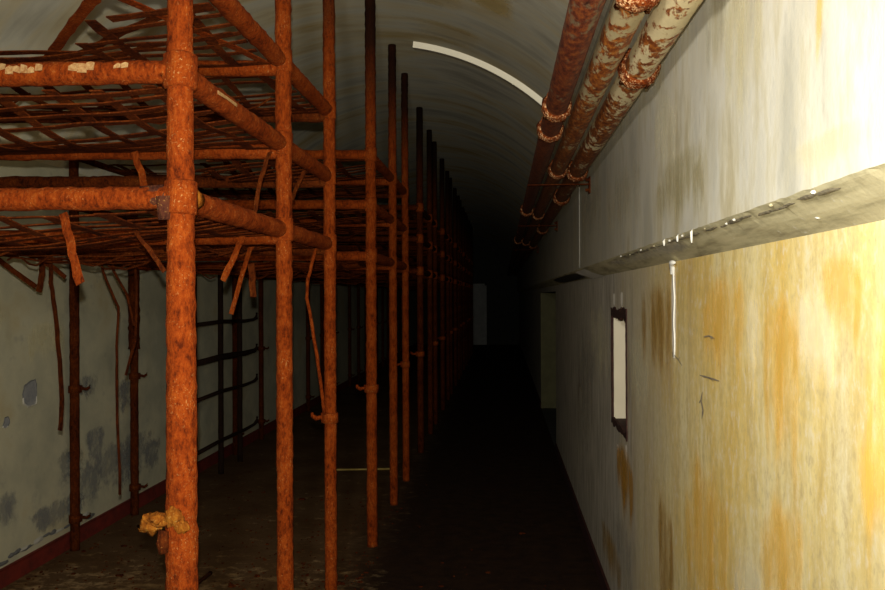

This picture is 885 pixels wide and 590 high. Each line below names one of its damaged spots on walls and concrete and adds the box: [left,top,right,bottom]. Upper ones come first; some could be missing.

leakage [554,274,585,283]